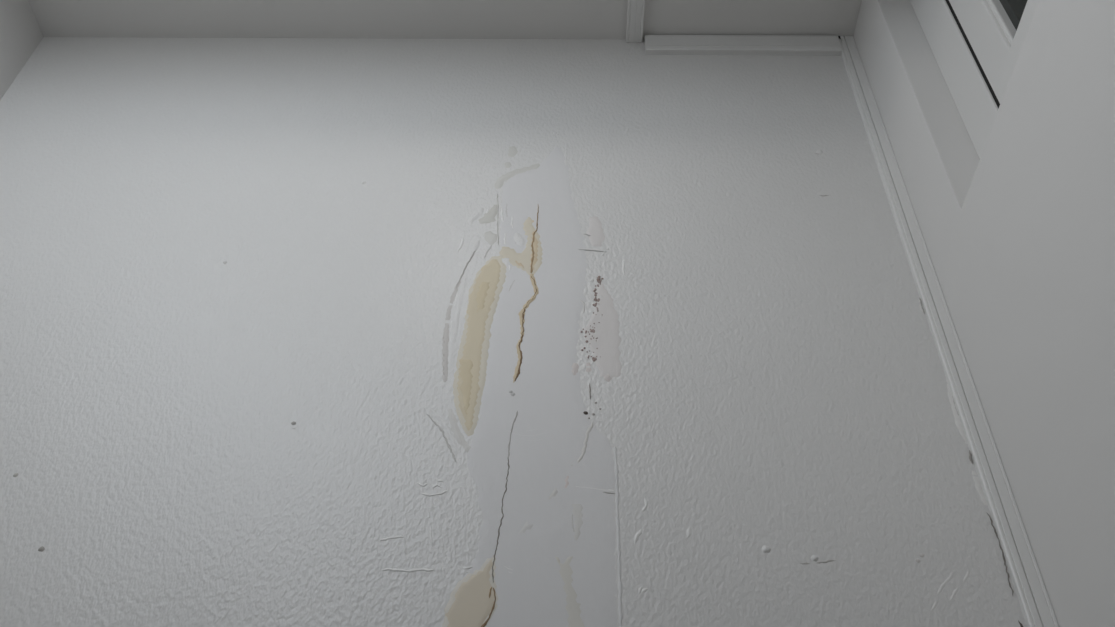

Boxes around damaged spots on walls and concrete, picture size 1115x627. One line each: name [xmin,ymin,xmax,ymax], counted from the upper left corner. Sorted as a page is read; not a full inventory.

crack [456,251,475,288]
peeling [450,258,511,431]
damp [442,205,543,452]
crack [515,207,539,381]
peeling [445,560,496,627]
crack [481,411,518,627]